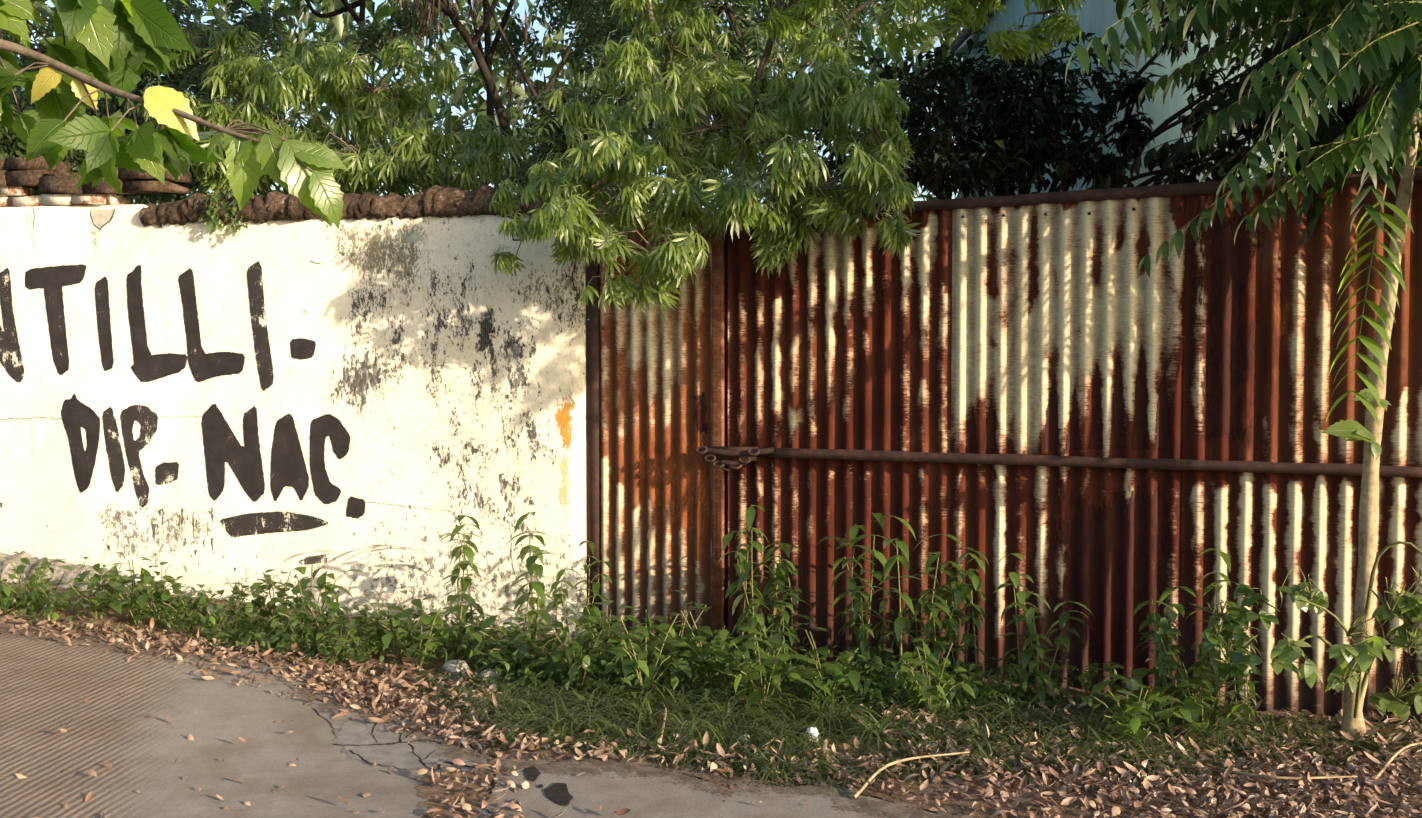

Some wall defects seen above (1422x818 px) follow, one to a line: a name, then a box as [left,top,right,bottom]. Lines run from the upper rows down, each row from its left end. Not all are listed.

leakage [325,217,433,320]
leakage [509,256,591,346]
corrosion [1184,194,1292,447]
corrosion [555,396,576,506]
corrosion [968,398,998,451]
corrosion [1044,344,1171,450]
leakage [440,458,473,570]
corrosion [1039,477,1177,695]